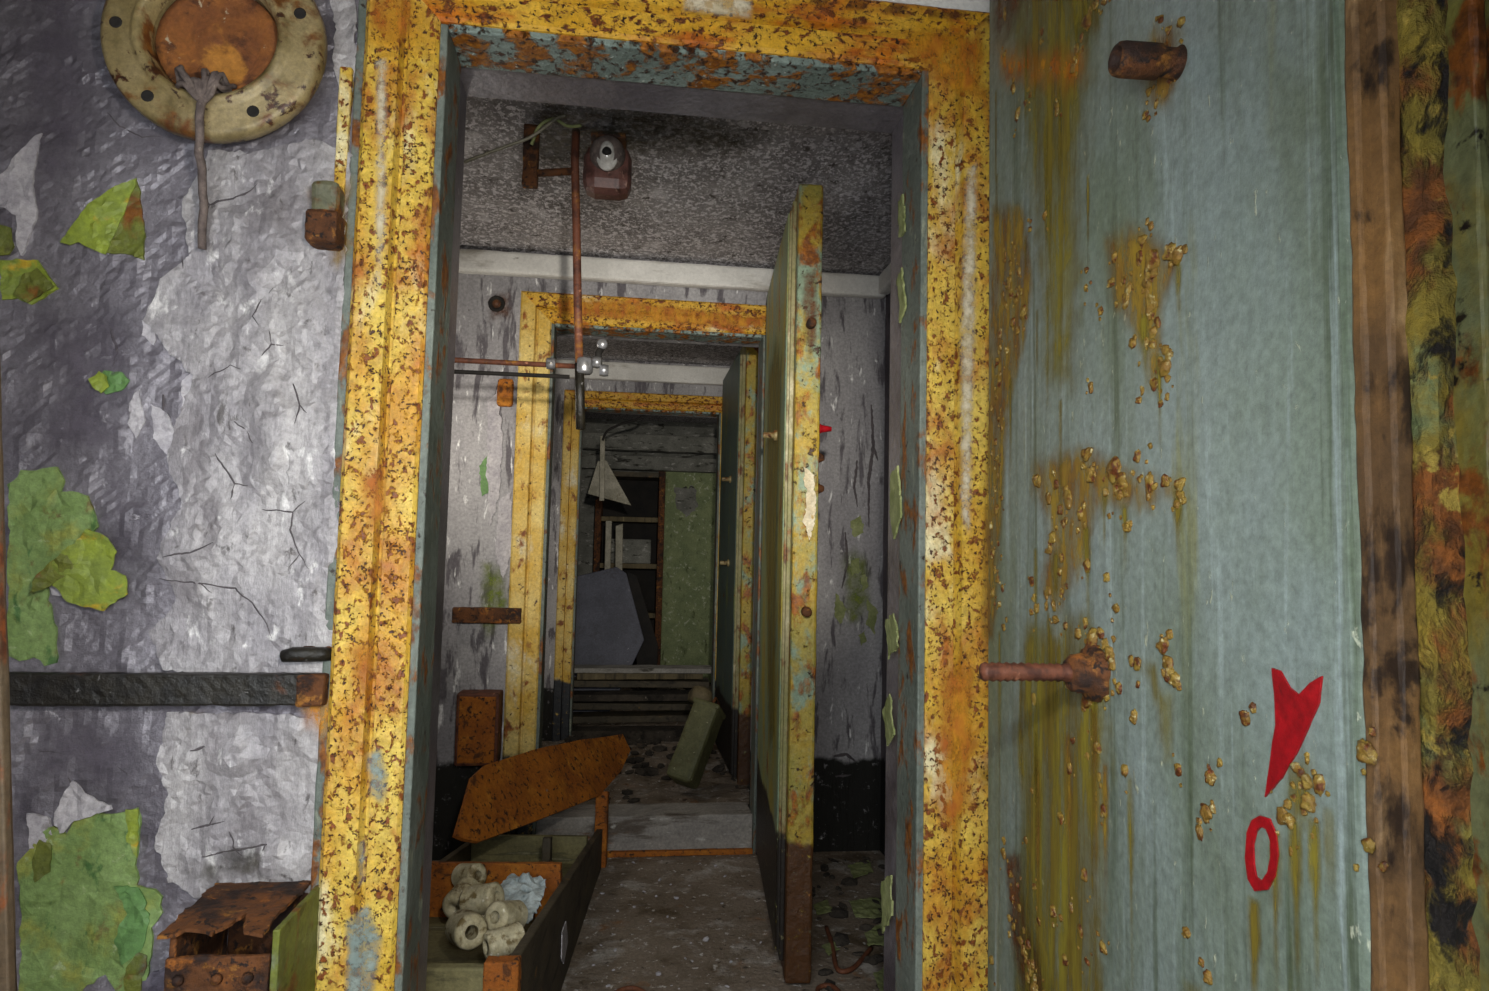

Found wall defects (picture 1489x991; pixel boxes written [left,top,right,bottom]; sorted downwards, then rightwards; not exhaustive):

corrosion [846,0,1188,662]
peeling [7,467,128,666]
peeling [16,712,320,991]
corrosion [1000,401,1187,991]
corrosion [1195,757,1223,841]
corrosion [1239,702,1257,726]
corrosion [1249,752,1331,983]
corrosion [1356,726,1378,776]
corrosion [1353,838,1389,872]
corrosion [1198,957,1213,985]